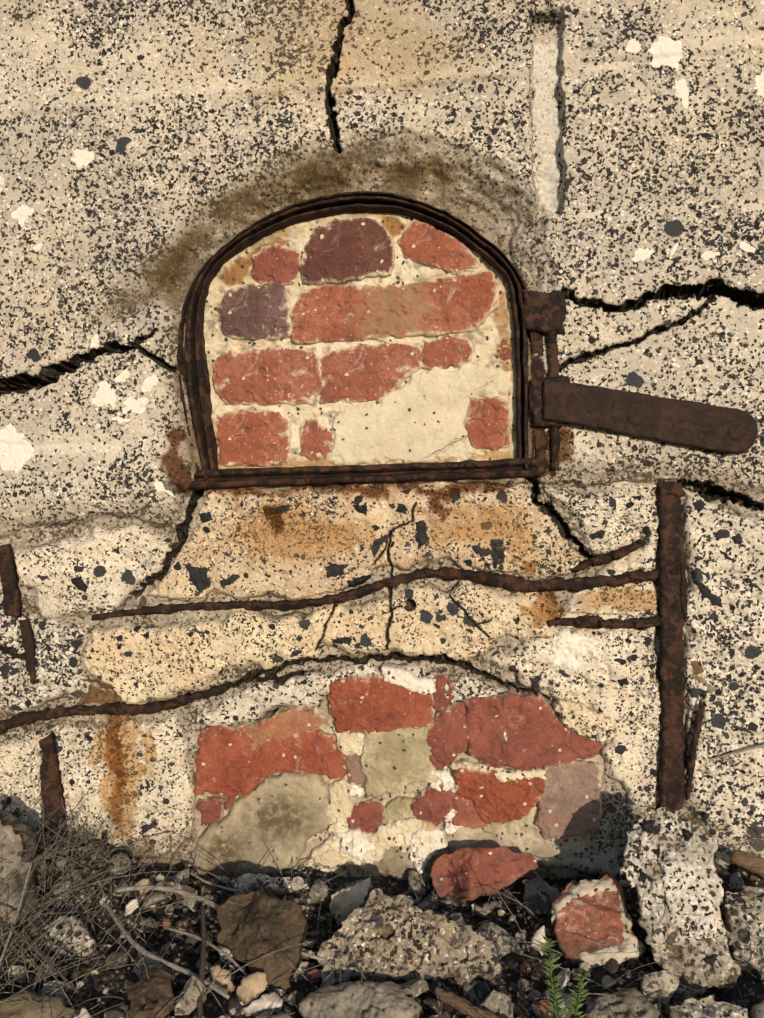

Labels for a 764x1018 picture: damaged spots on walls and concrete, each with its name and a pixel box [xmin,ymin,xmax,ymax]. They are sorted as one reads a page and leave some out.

crack [325,0,355,154]
crack [0,328,177,397]
crack [559,279,764,372]
crack [129,490,205,597]
rust [163,428,192,492]
crack [525,478,598,566]
crack [680,478,764,511]
flaking render [0,481,662,1018]
peeling [655,990,699,1010]